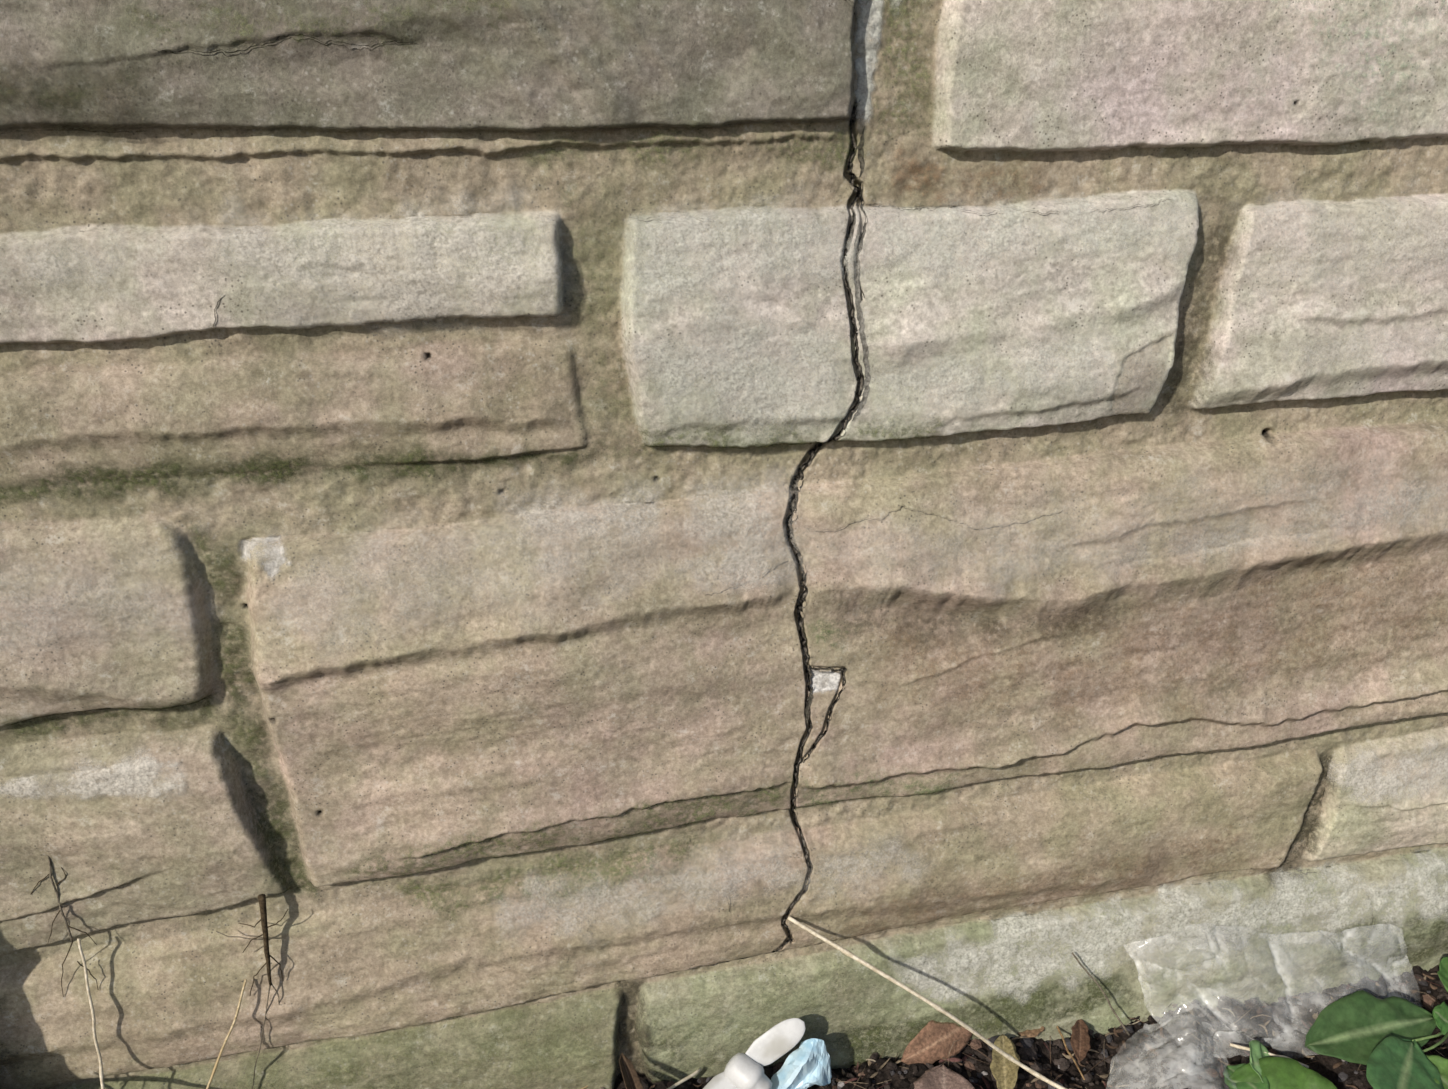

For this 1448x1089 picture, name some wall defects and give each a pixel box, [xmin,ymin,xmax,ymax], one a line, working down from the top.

crack [708,105,1170,966]
water stain [902,850,1448,1000]
water stain [616,980,652,1082]